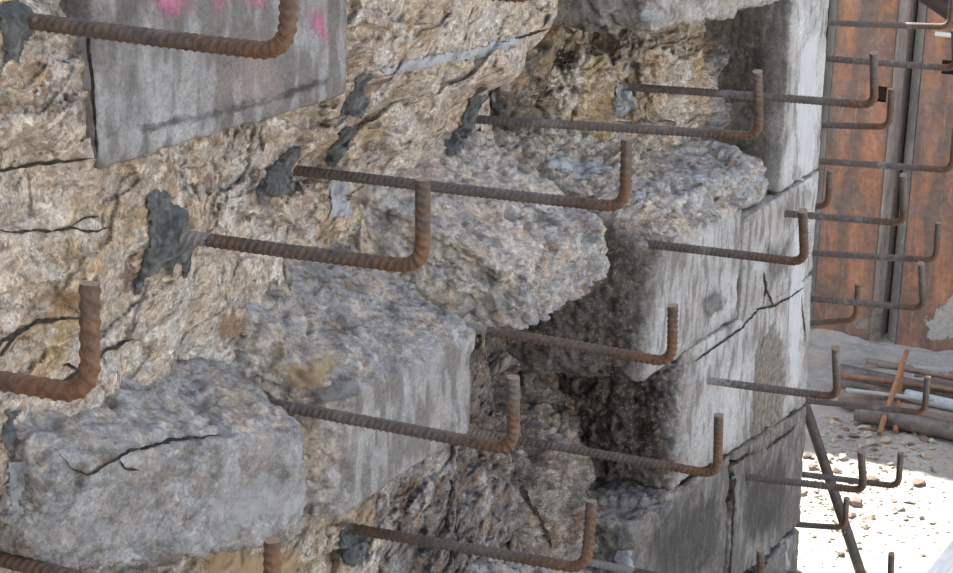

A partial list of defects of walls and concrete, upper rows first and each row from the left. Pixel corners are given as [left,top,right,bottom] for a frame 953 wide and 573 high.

spalling [27,0,299,60]
crack [0,38,98,173]
spalling [178,0,953,273]
crack [0,215,110,234]
spalling [644,126,953,327]
crack [0,317,79,357]
spalling [0,280,102,403]
crack [696,272,806,361]
crack [56,435,222,476]
spalling [267,374,724,477]
corrosion [198,551,264,573]
spalling [340,499,662,573]